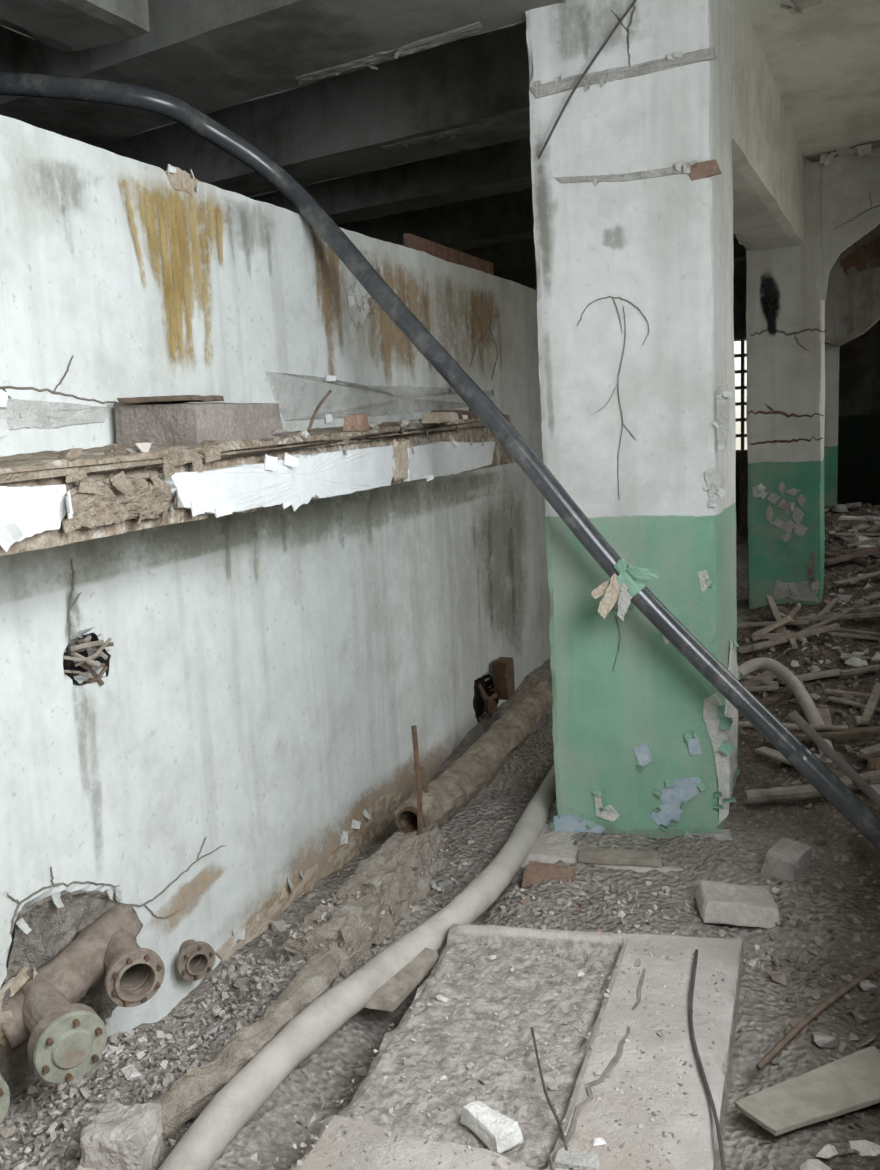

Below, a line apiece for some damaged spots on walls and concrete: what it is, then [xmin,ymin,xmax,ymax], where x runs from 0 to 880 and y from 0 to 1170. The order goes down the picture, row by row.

corrosion [121,183,227,360]
spalling [840,237,880,279]
corrosion [314,238,343,376]
crack [751,328,826,351]
crack [748,404,824,445]
peeling [0,371,495,552]
peeling [751,481,809,542]
peeling [728,639,744,680]
peeling [633,743,653,771]
peeling [650,693,740,841]